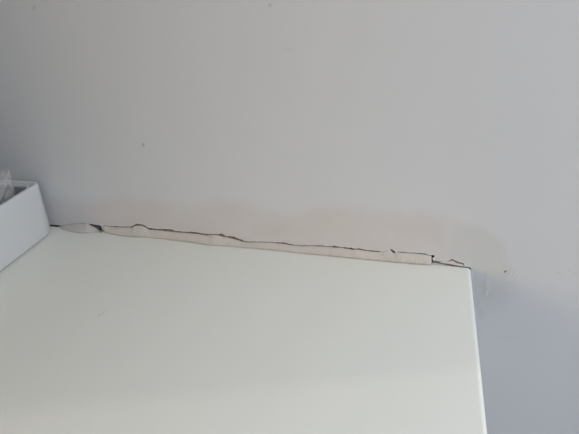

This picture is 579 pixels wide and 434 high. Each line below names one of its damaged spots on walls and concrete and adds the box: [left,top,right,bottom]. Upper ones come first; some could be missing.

crack [103,224,471,269]